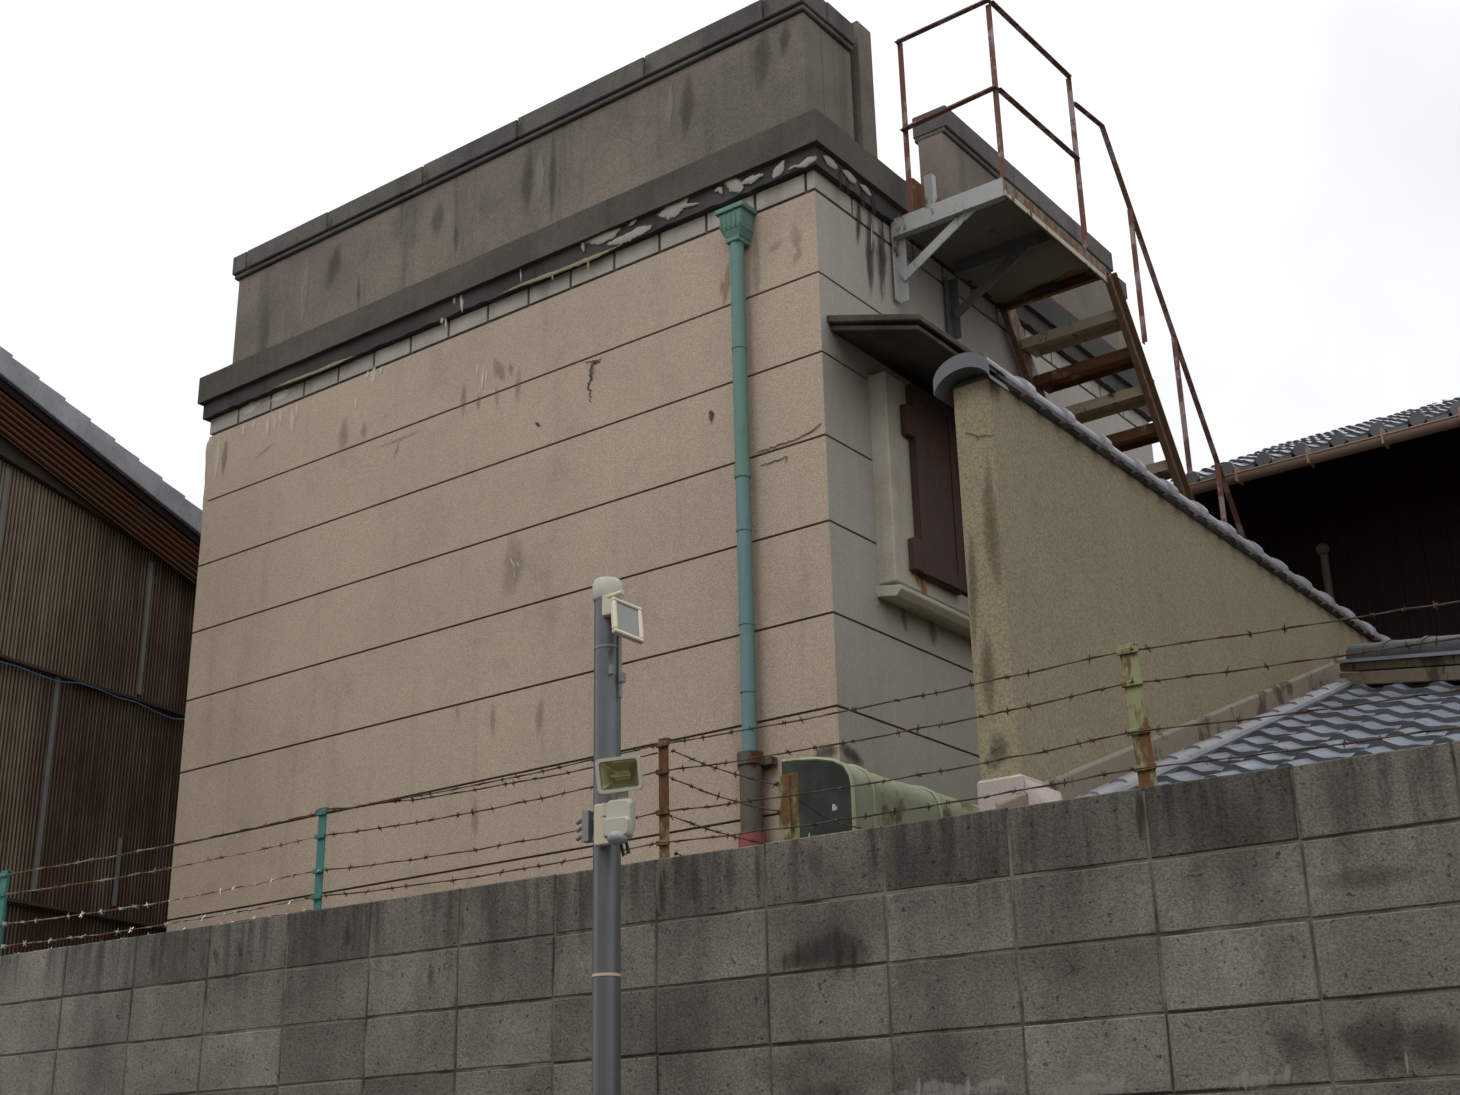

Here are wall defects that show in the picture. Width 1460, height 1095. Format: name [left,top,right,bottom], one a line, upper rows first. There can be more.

flaking render [715,155,876,212]
flaking render [504,197,699,293]
damp [857,204,886,283]
crack [585,357,602,402]